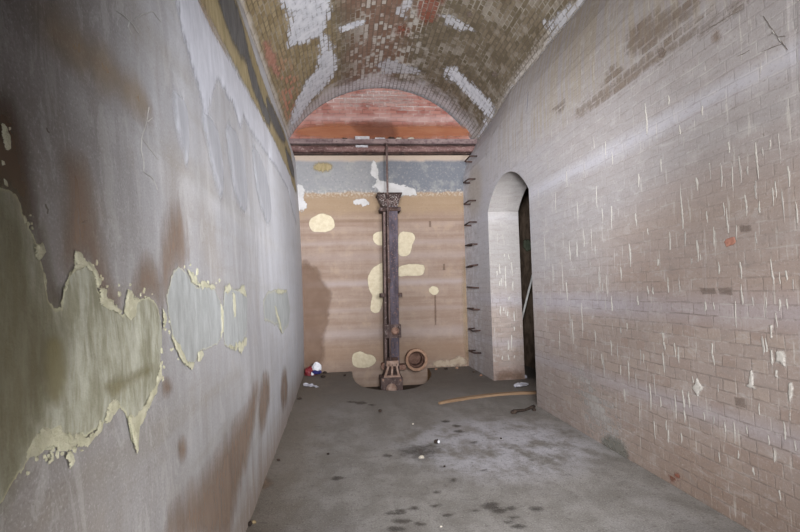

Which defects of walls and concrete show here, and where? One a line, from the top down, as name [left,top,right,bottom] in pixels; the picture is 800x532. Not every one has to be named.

crack [739,16,788,56]
peeling [1,123,11,150]
damp [709,133,790,218]
peeling [309,213,335,232]
peeling [368,263,383,313]
peeling [0,179,247,504]
damp [302,264,330,369]
peeling [352,351,376,368]